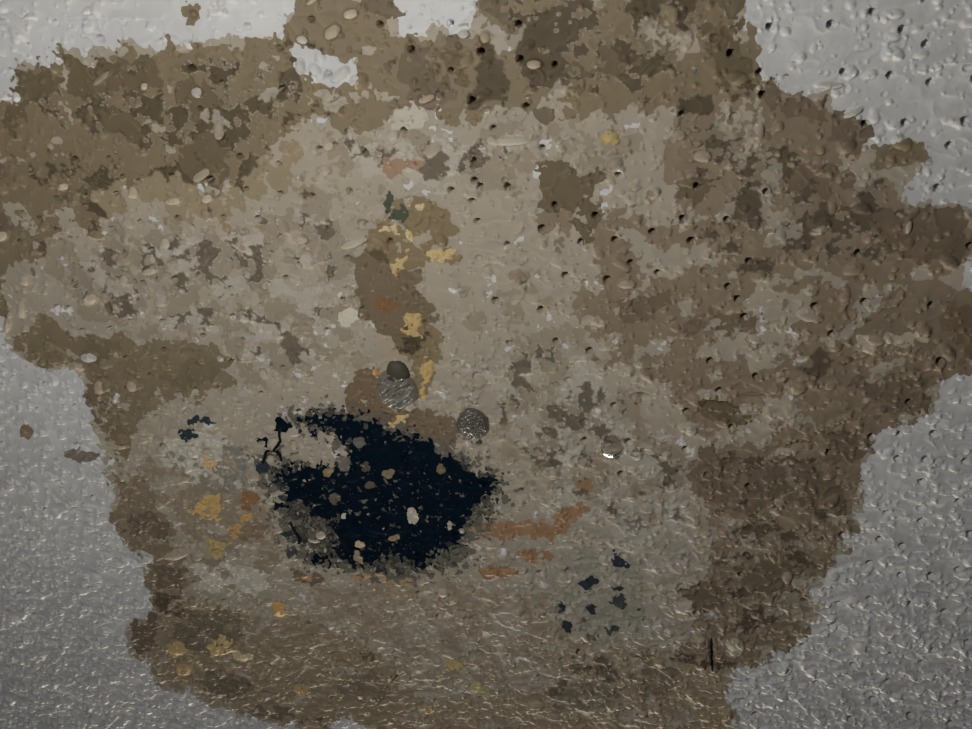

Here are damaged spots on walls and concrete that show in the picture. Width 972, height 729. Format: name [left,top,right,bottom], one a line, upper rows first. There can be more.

damp [181,1,201,26]
damp [20,424,33,440]